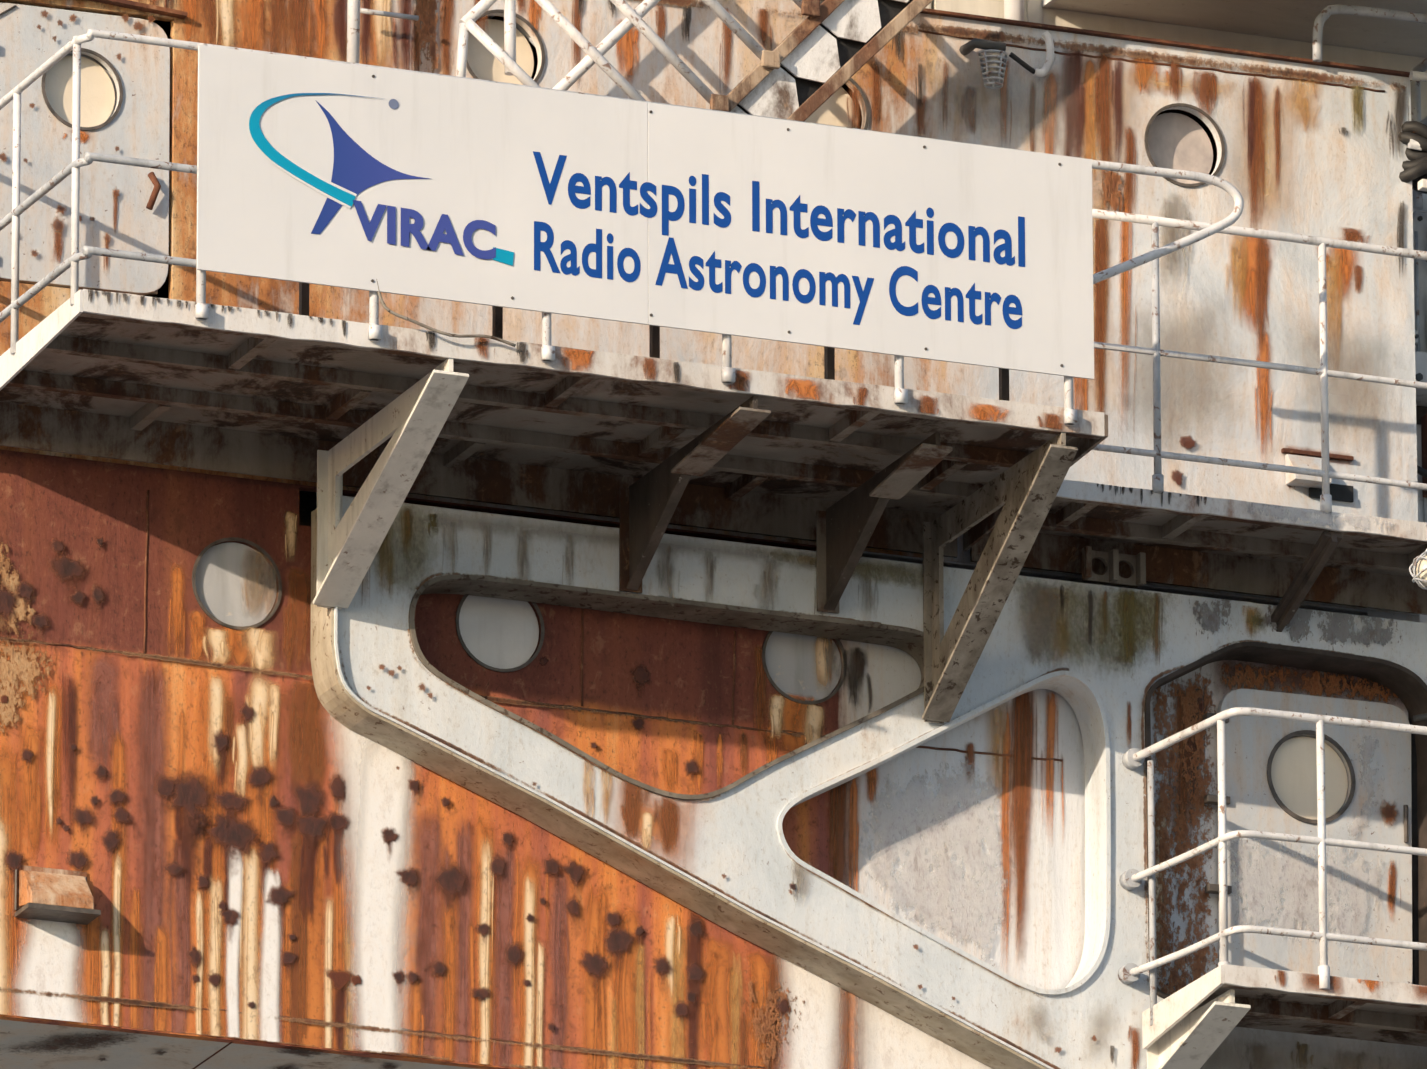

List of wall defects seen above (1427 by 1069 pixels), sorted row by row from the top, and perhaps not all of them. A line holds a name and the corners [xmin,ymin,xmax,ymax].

rust [122,0,453,75]
rust [572,0,584,65]
rust [634,0,707,39]
rust [892,23,1405,446]
peeling [0,542,53,735]
mould [1031,585,1160,666]
rust [0,512,805,1069]
rust [357,638,905,986]
rust [1002,668,1069,949]
rust [1127,612,1402,995]
rust [949,996,1062,1069]
rust [1128,1026,1139,1069]